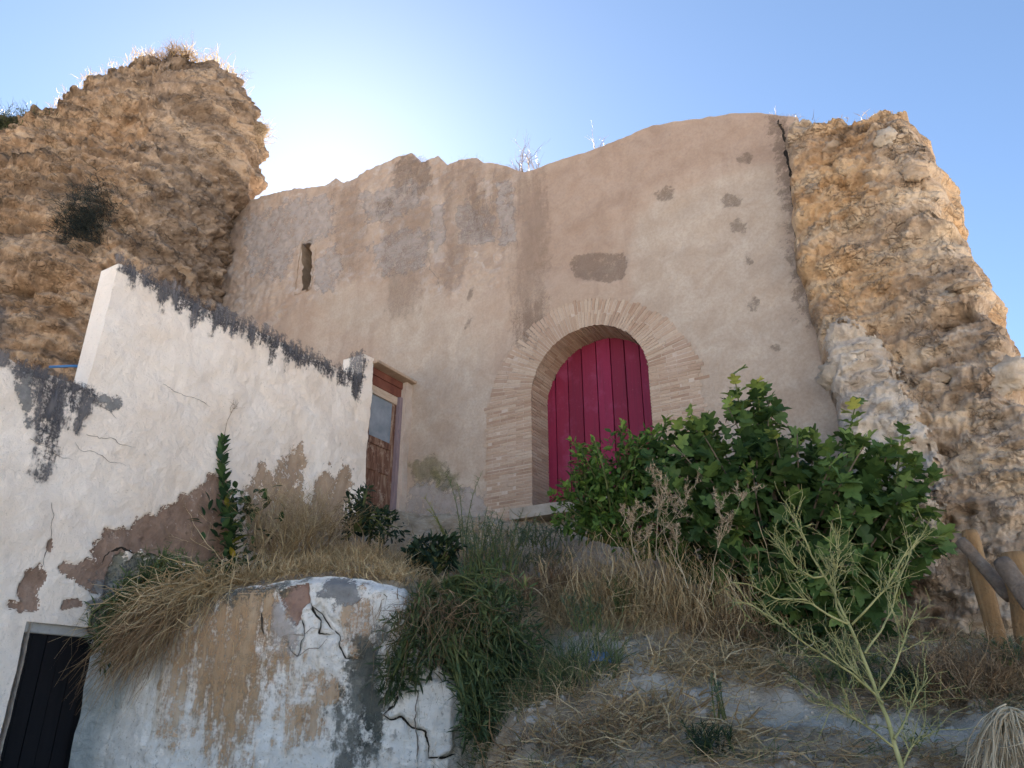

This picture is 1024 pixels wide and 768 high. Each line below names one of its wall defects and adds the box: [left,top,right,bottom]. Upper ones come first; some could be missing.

crack [777,119,793,207]
leakage [114,252,367,399]
leakage [0,349,123,483]
spalling [8,441,355,634]
crack [261,604,359,659]
crack [384,693,455,762]